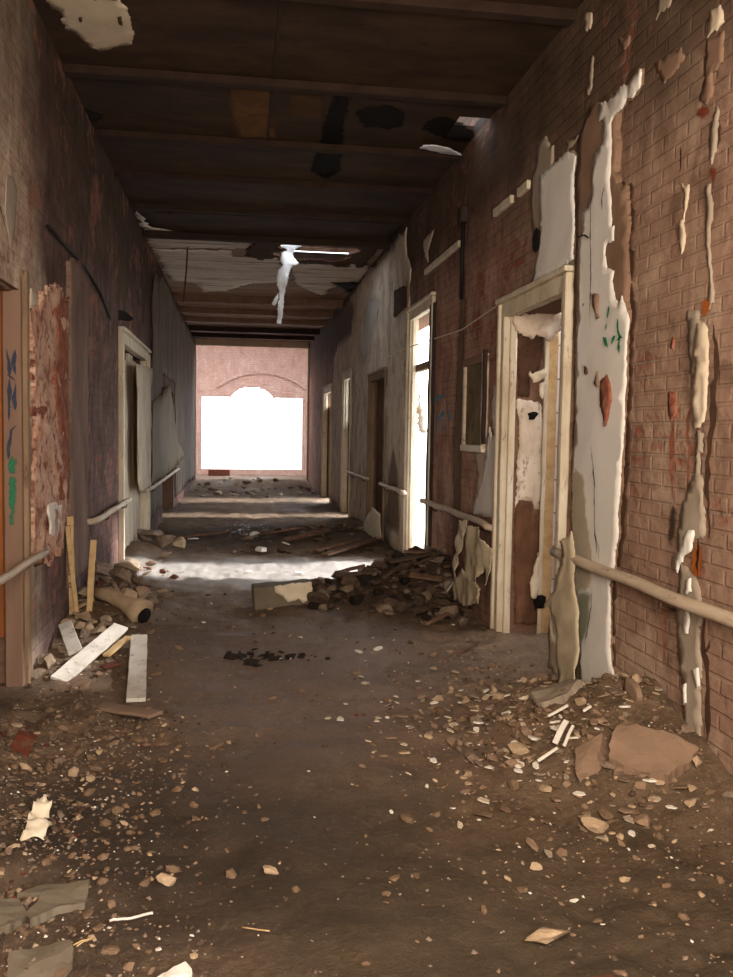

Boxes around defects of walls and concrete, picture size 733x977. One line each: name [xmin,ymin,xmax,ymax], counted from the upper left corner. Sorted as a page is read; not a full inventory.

peeling [46,0,135,51]
spalling [29,258,89,588]
peeling [135,211,412,552]
peeling [530,48,685,682]
peeling [667,183,715,602]
peeling [675,607,703,736]